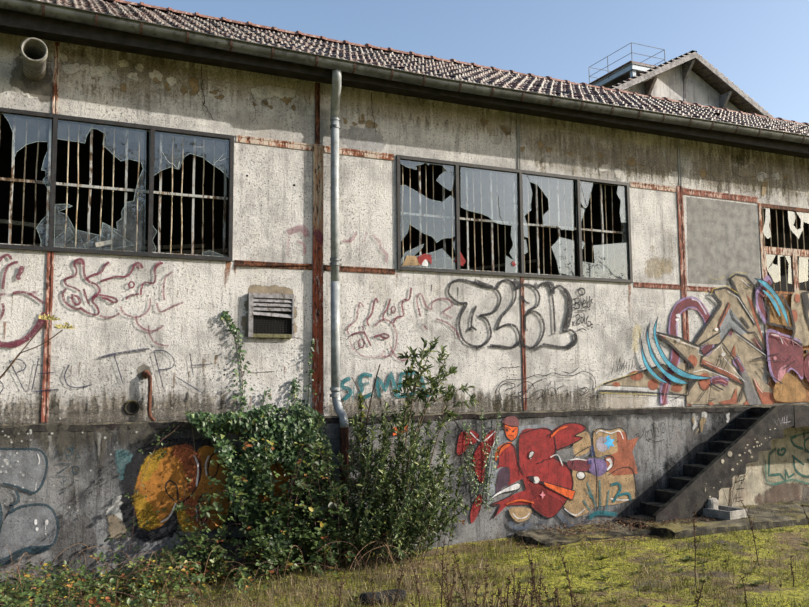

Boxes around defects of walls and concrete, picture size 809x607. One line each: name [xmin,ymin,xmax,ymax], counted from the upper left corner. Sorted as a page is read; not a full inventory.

spalling [241,285,297,339]
damp [0,395,237,488]
damp [329,390,753,520]